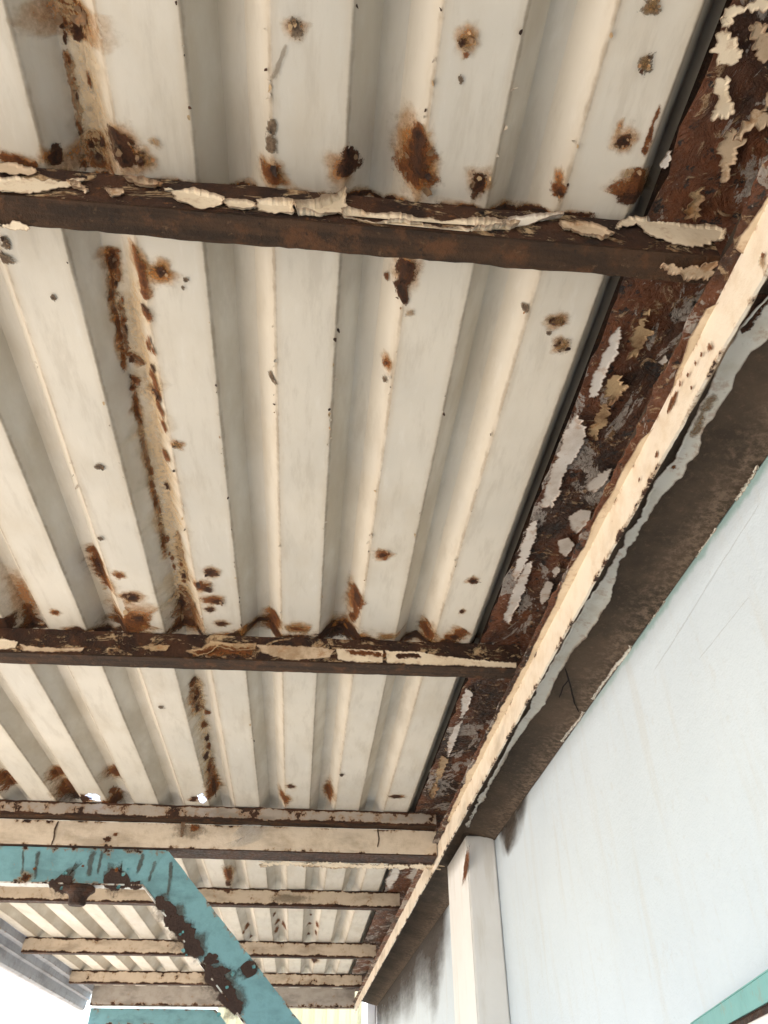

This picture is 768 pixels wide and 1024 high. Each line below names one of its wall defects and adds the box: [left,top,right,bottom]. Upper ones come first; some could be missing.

corrosion [0,0,114,174]
peeling [709,0,768,183]
peeling [0,162,90,194]
peeling [105,175,727,248]
corrosion [392,114,596,218]
corrosion [101,244,479,659]
peeling [0,638,84,653]
corrosion [63,537,155,633]
peeling [186,429,653,822]
peeling [465,276,768,828]
corrosion [189,677,222,800]
leakage [500,796,526,852]